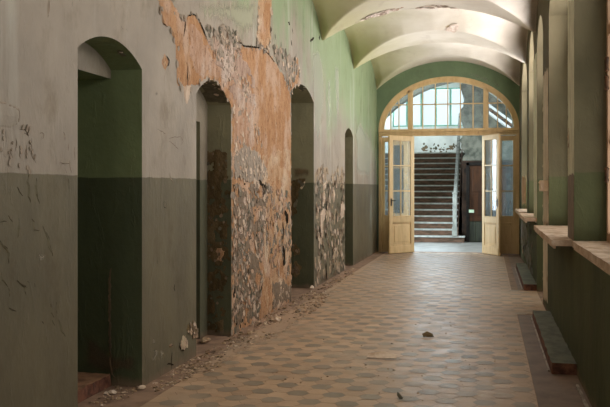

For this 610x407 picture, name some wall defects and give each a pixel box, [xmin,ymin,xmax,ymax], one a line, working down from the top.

flaking render [158,0,307,336]
peeling [315,164,345,287]
flaking render [179,320,199,351]